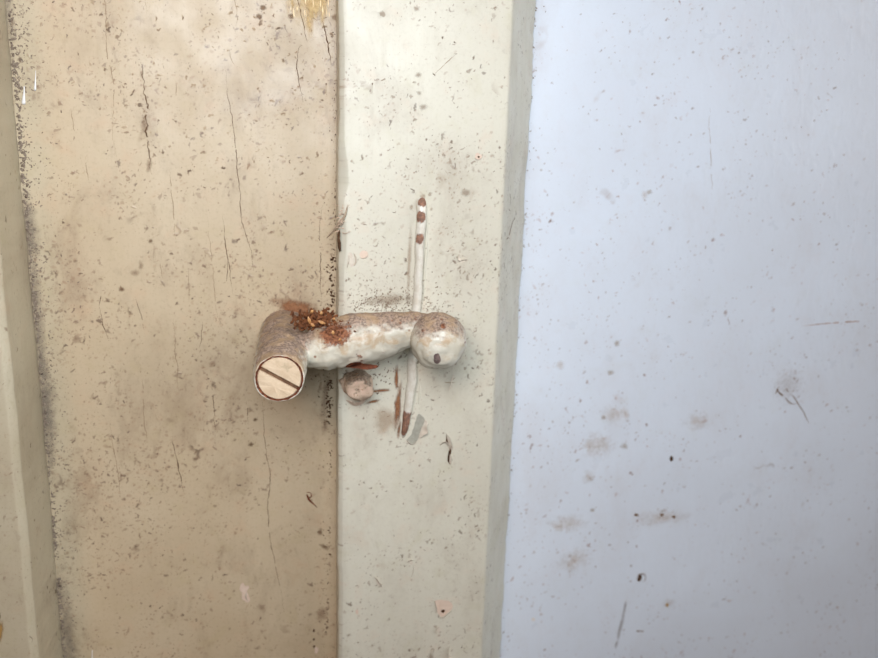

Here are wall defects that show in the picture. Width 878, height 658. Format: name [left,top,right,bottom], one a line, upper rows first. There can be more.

crack [141,64,151,171]
corrosion [281,300,311,314]
peeling [407,414,428,445]